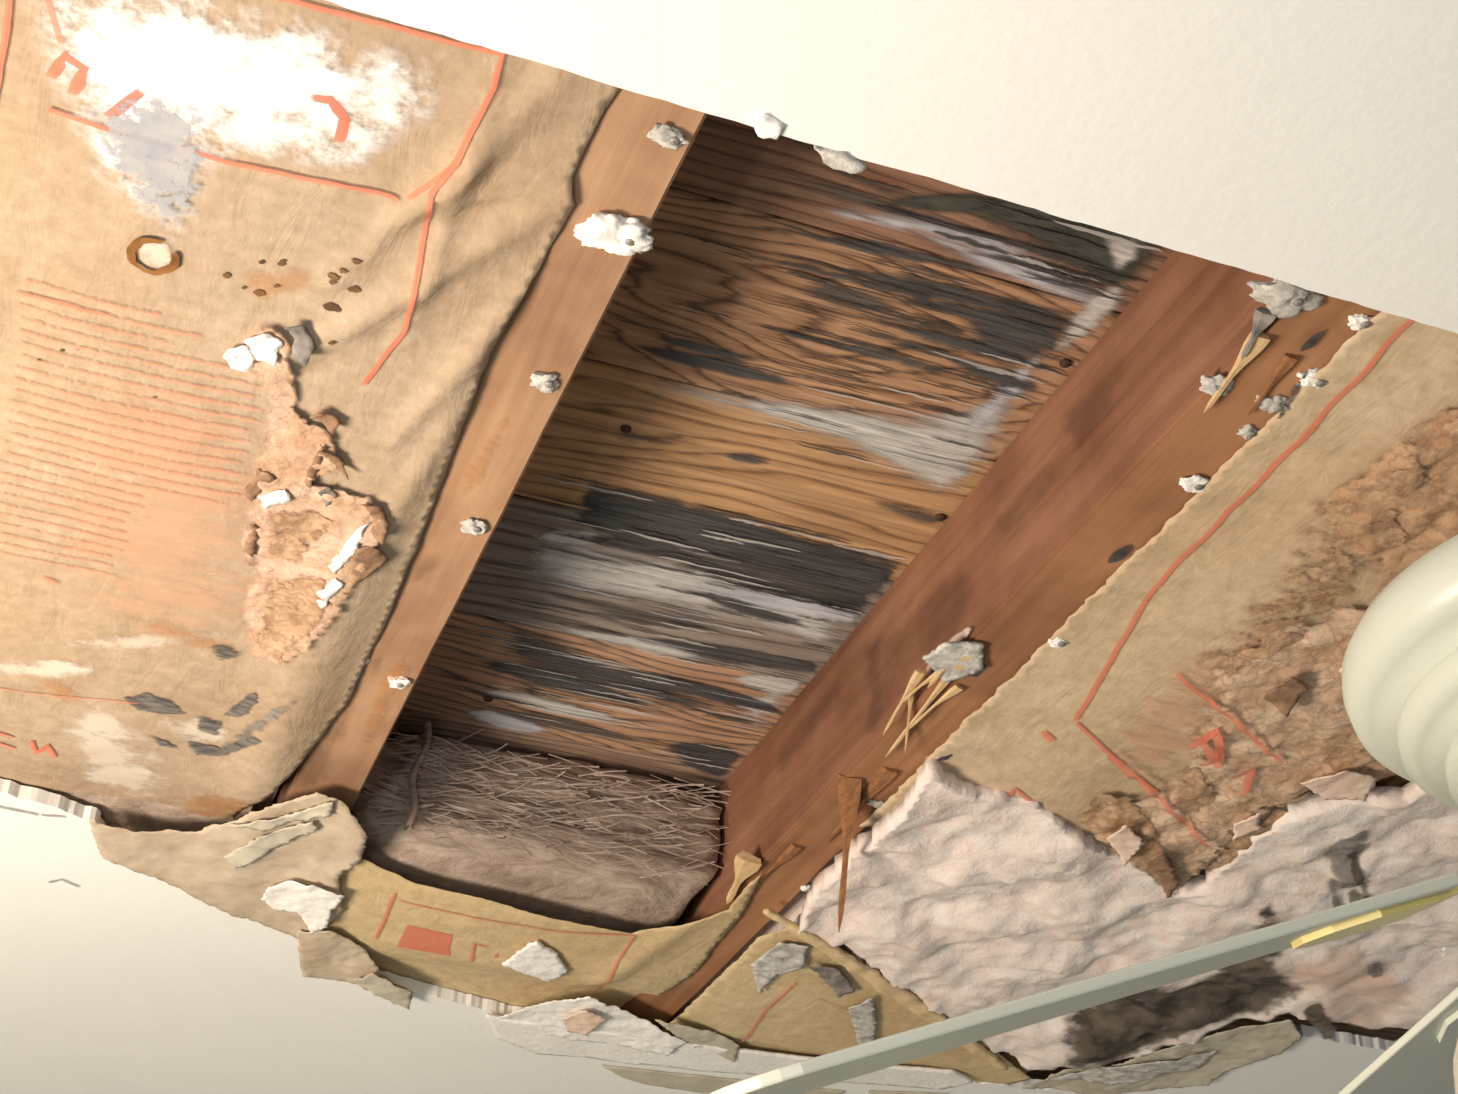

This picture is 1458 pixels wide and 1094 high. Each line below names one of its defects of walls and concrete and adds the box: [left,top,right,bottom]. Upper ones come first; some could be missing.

damp [222,273,280,297]
damp [322,258,361,312]
damp [613,170,1160,492]
damp [878,504,935,523]
damp [436,474,905,777]
damp [949,628,970,642]
damp [1323,831,1368,908]
damp [1258,907,1276,929]
damp [1368,962,1382,978]
damp [1062,952,1336,1068]
peeling [486,1013,814,1093]
peeling [801,1065,973,1094]